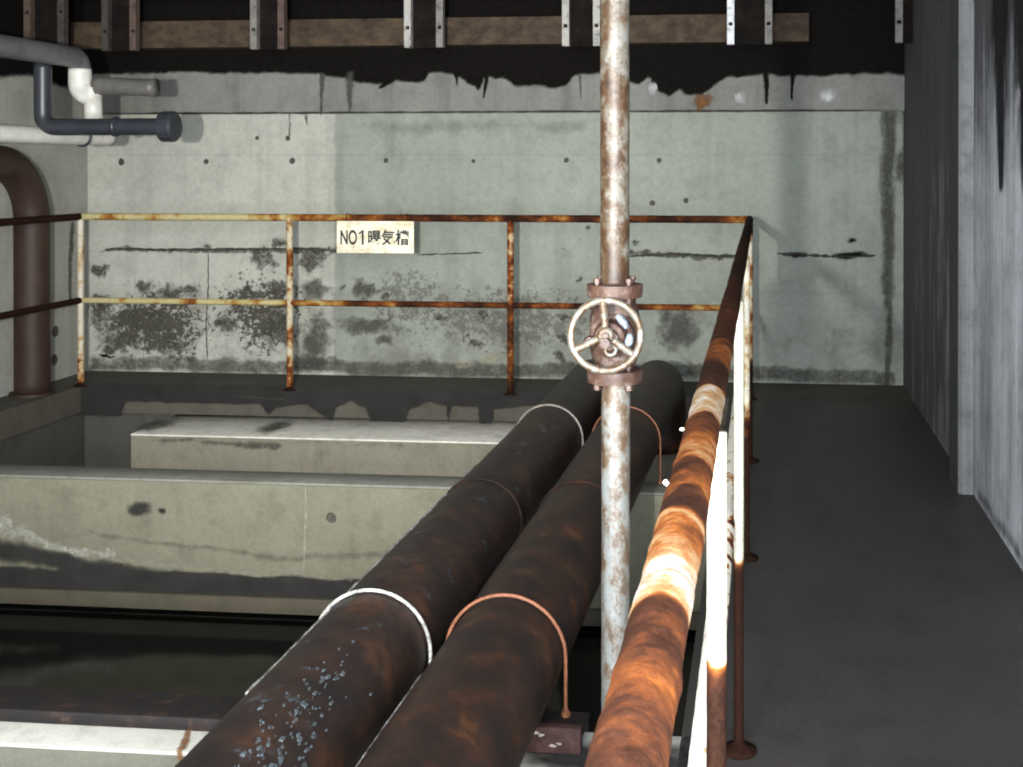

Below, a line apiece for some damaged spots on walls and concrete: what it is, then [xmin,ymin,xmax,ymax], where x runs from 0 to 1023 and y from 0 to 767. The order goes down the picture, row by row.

damp [81,240,575,432]
damp [0,519,359,598]